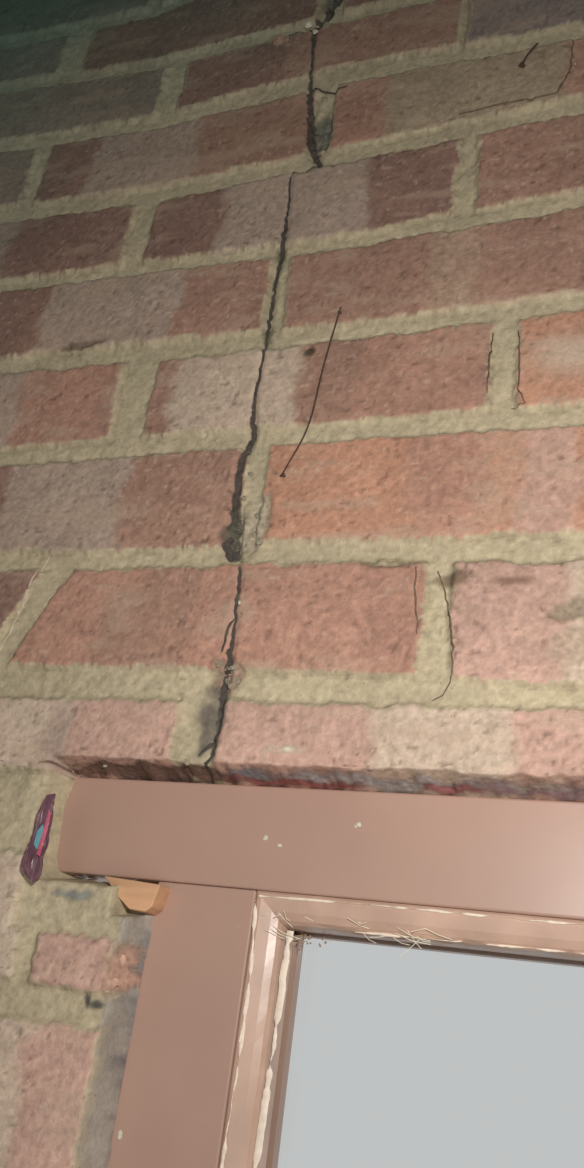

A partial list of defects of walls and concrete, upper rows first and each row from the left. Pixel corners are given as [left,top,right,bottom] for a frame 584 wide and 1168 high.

crack [198,0,347,784]